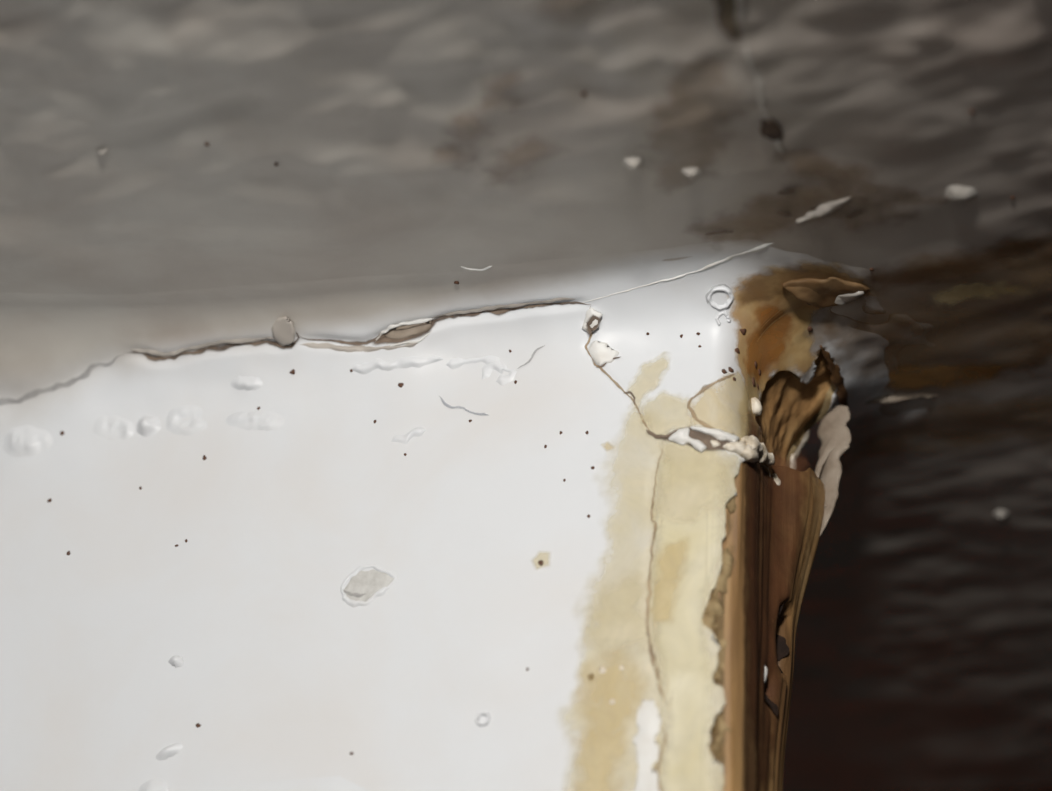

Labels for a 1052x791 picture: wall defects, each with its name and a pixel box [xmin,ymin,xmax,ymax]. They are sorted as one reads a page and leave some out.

leakage [777,189,863,224]
crack [125,328,417,361]
flaking render [646,345,852,538]
peeling [782,276,870,307]
peeling [865,393,938,405]
leakage [858,243,1052,389]
crack [431,298,668,791]
leakage [571,414,737,791]
flaking render [703,541,733,680]
flaking render [709,713,732,760]